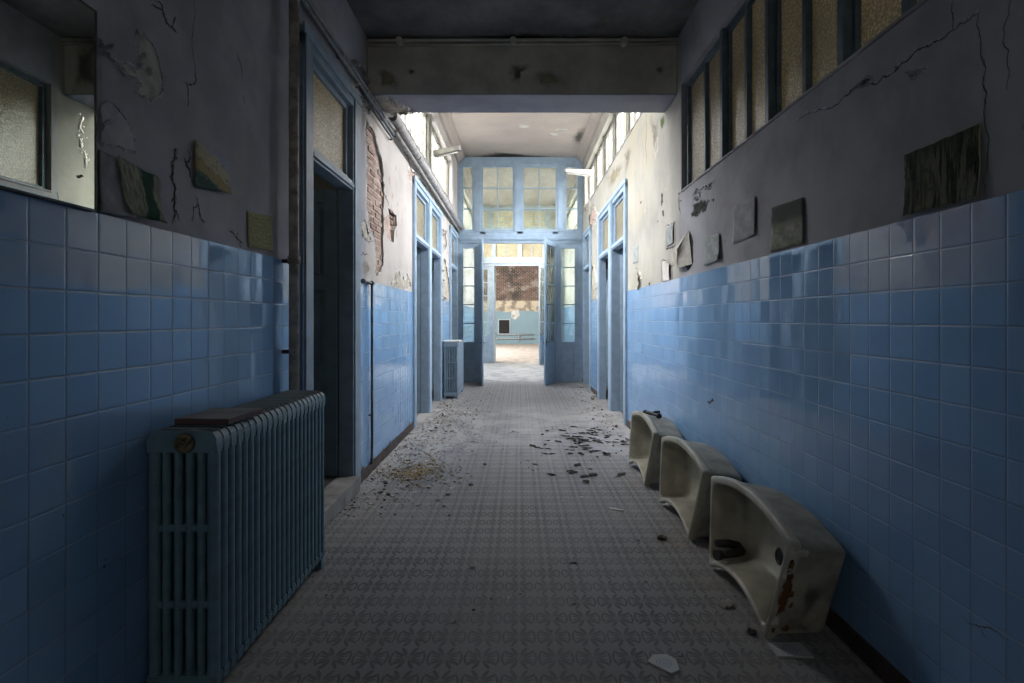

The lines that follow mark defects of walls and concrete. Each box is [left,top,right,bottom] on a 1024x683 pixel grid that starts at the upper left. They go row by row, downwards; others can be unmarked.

peeling [79,99,136,161]
crack [151,0,198,109]
crack [169,148,205,224]
flaking render [352,58,415,276]
crack [795,0,1011,195]